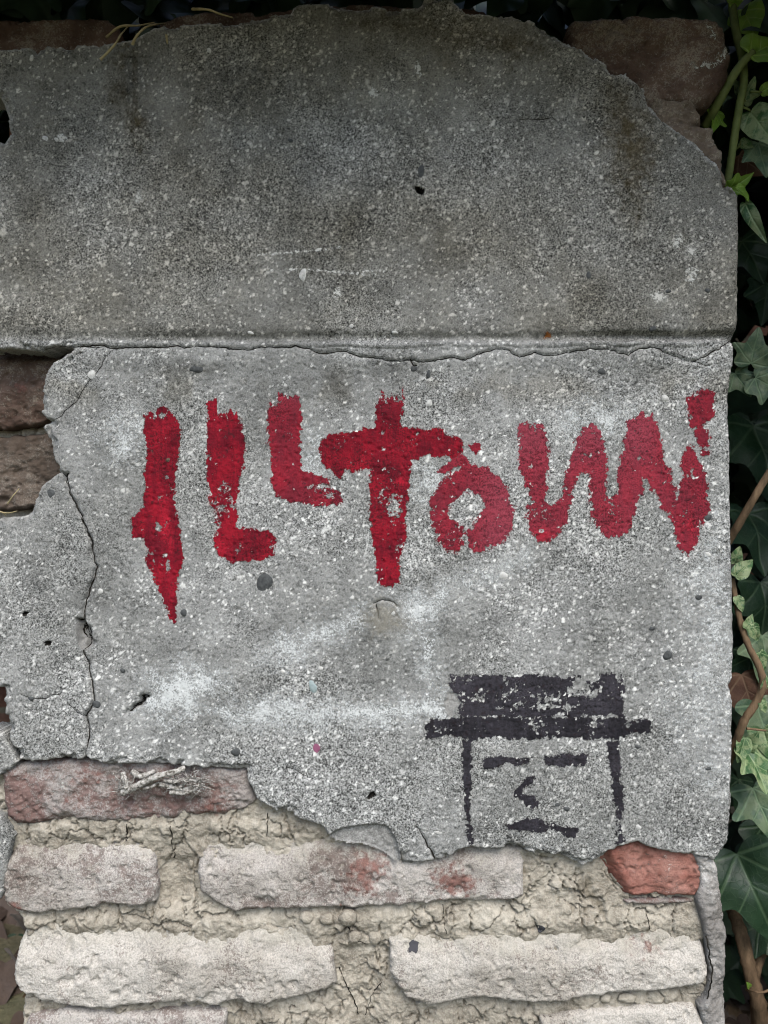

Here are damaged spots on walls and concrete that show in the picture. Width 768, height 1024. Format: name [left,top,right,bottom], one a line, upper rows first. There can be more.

crack [44,340,731,422]
spalling [330,823,401,906]
peeling [431,862,482,900]